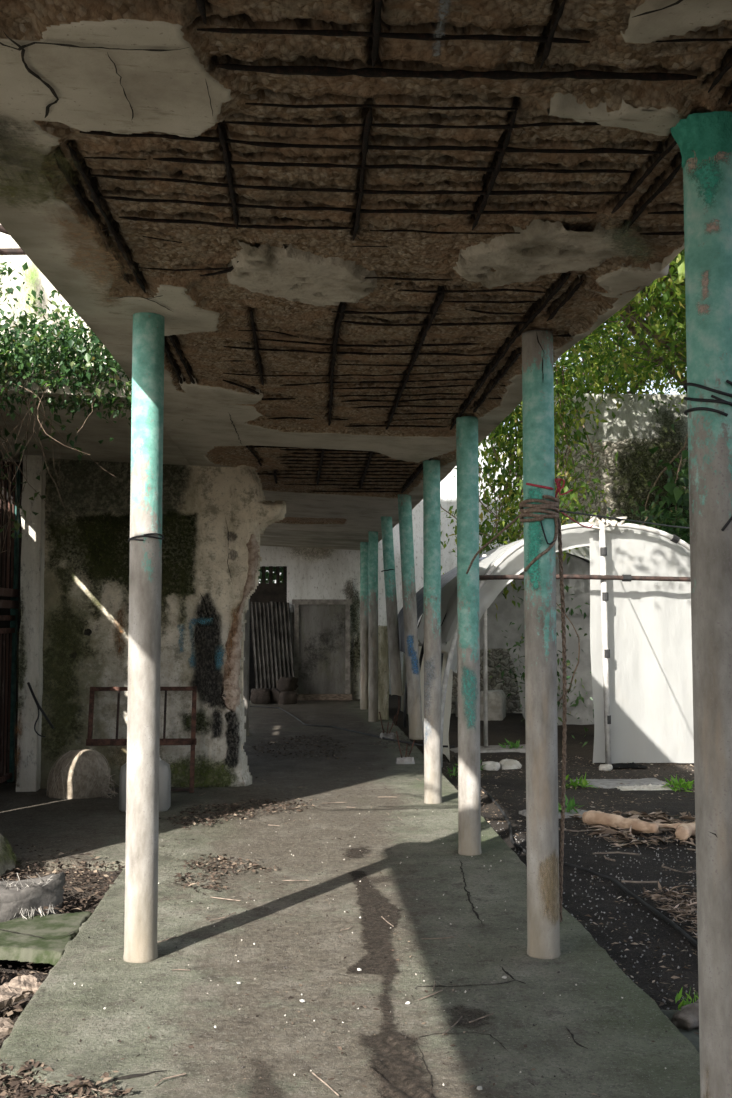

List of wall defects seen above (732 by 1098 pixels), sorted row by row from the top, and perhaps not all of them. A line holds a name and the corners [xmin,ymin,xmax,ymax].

crack [634,0,683,17]
crack [0,31,189,119]
spalling [0,0,732,437]
spalling [206,445,456,498]
flaking render [564,438,689,536]
leakage [161,464,197,632]
leakage [41,458,131,760]
flaking render [222,534,259,713]
leakage [180,711,212,734]